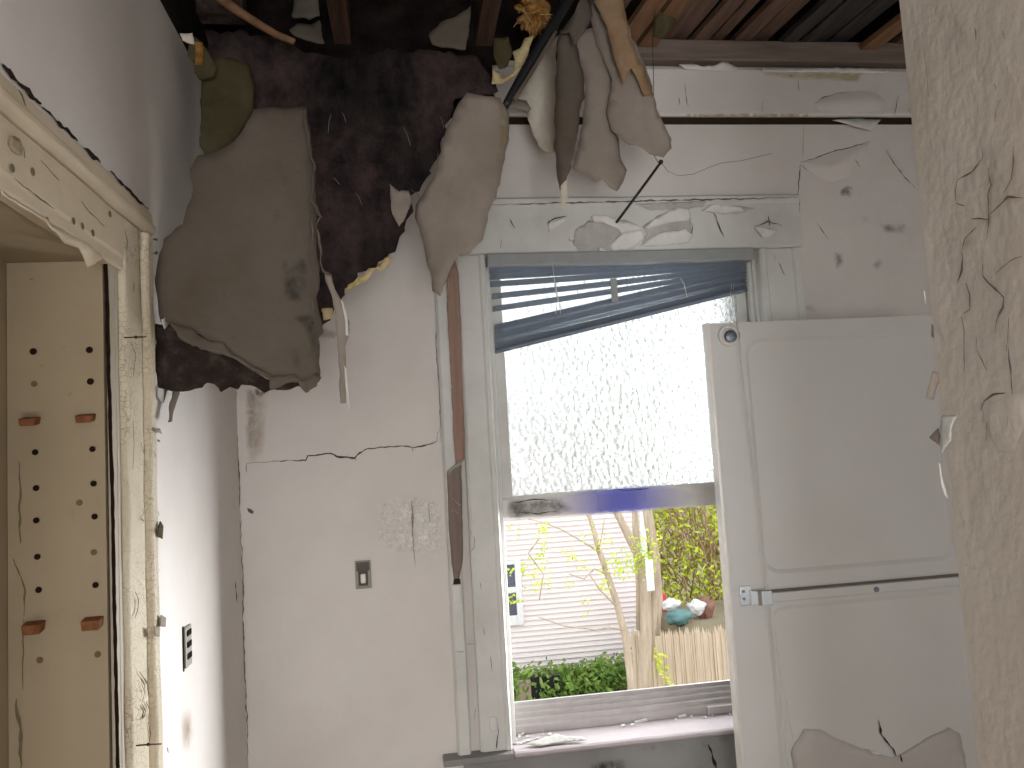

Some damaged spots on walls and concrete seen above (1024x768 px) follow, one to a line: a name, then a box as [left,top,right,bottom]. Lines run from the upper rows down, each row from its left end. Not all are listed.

peeling [180,33,195,45]
peeling [569,201,755,252]
crack [955,151,1021,390]
peeling [153,386,180,457]
crack [237,335,441,761]
peeling [154,615,166,637]